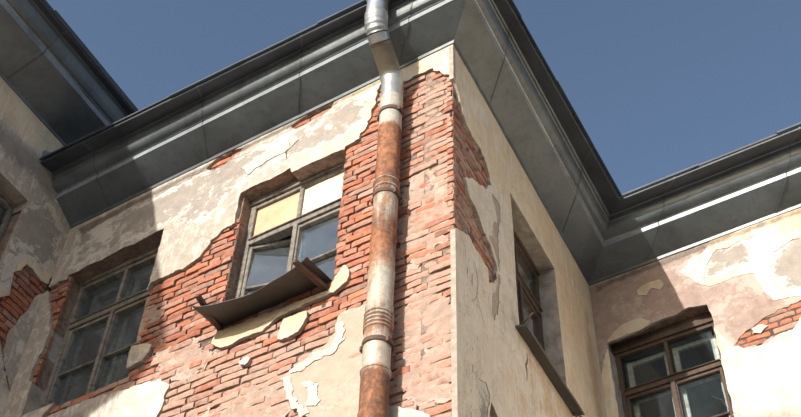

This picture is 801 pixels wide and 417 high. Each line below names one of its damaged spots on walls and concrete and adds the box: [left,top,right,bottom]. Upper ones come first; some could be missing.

flaking render [0,89,381,417]
flaking render [388,72,500,417]
flaking render [589,236,801,375]